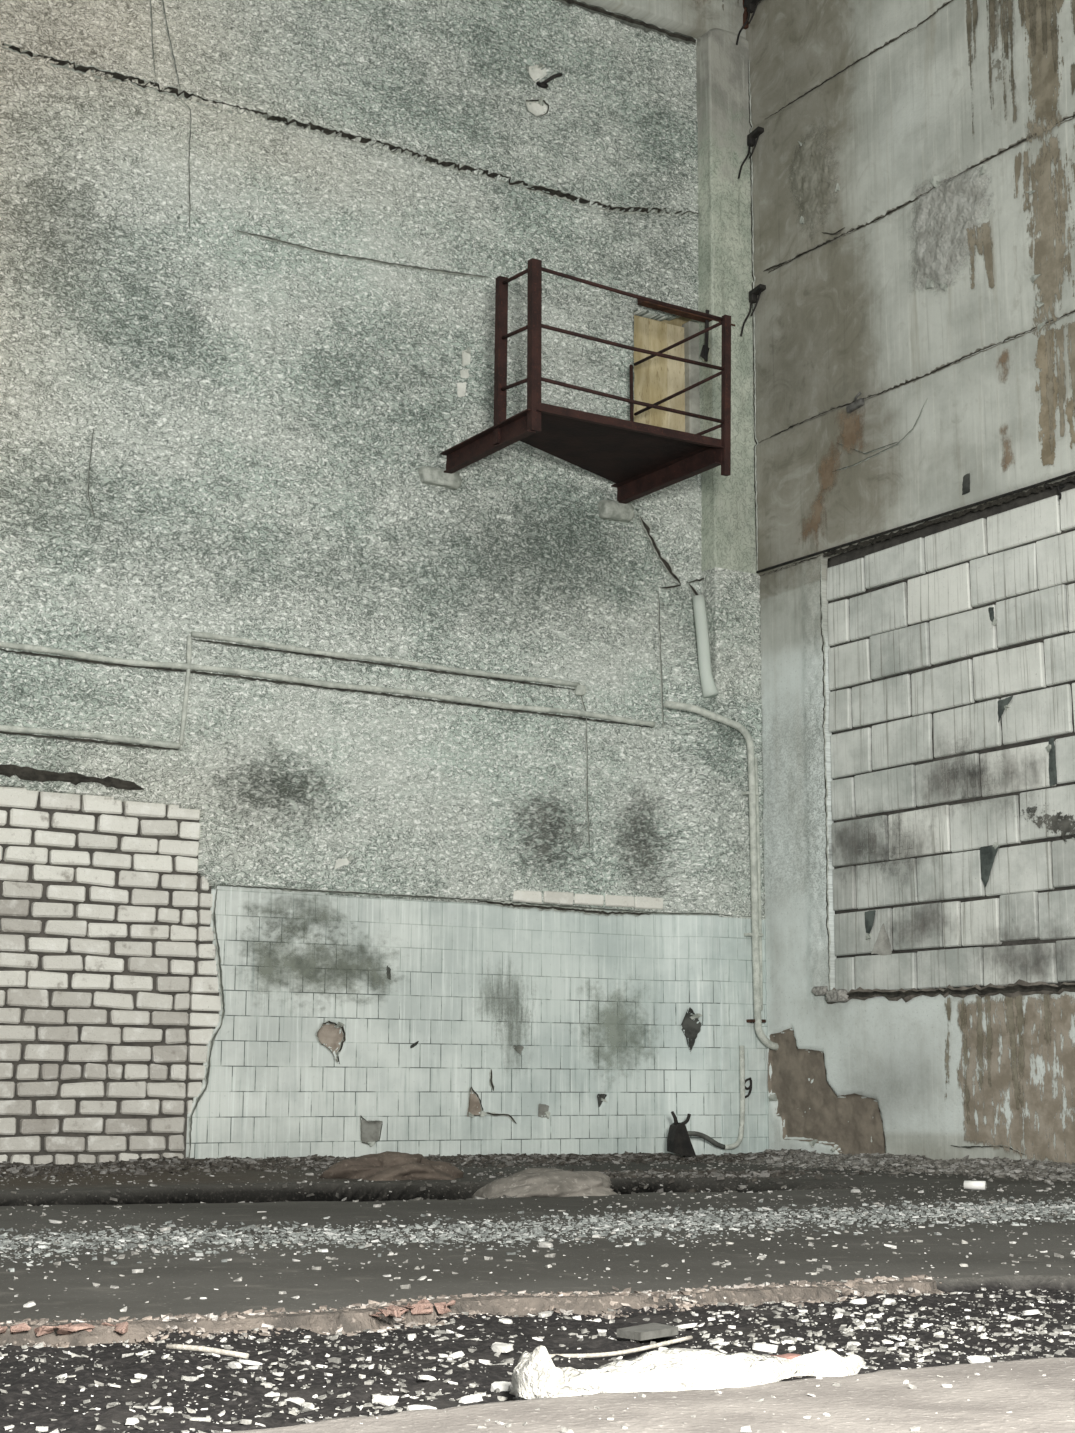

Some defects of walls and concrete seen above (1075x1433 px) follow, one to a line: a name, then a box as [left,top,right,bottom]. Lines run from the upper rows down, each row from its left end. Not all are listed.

crack [1,0,699,229]
crack [237,230,489,278]
peeling [1013,111,1075,338]
crack [639,516,704,727]
crack [220,884,764,918]
water stain [254,909,388,989]
spalling [316,1020,346,1064]
spalling [360,1116,383,1147]
crack [486,1069,517,1124]
spalling [681,1007,702,1051]
spalling [768,1028,886,1155]
peeling [945,994,1075,1165]